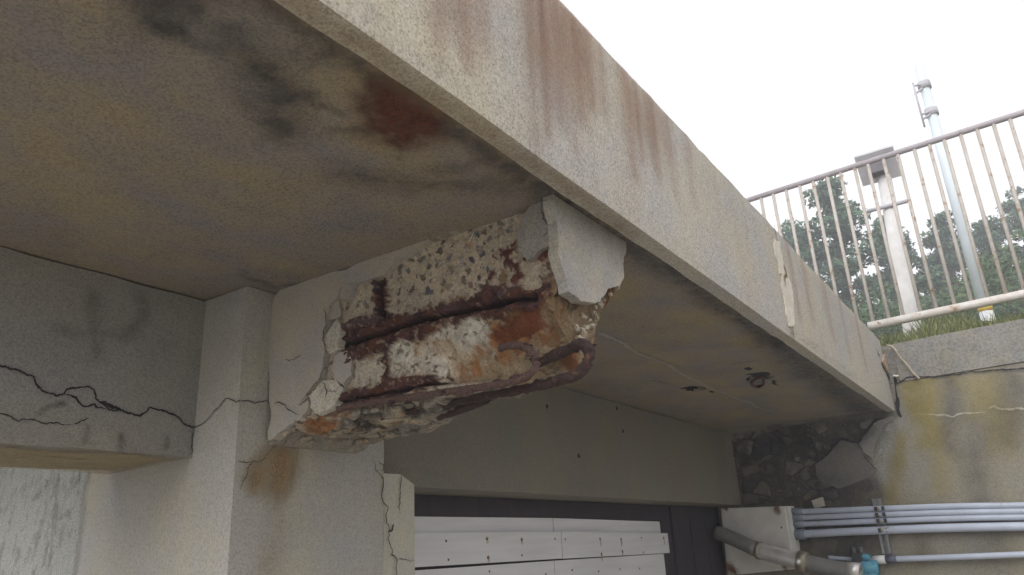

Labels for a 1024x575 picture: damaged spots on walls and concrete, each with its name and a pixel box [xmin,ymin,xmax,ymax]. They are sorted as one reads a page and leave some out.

damp [260,0,401,87]
corrosion [360,81,444,148]
crack [0,365,308,455]
spalling [269,212,620,454]
spalling [744,367,777,389]
crack [877,351,1024,418]
peeling [731,416,894,508]
crack [373,461,415,575]